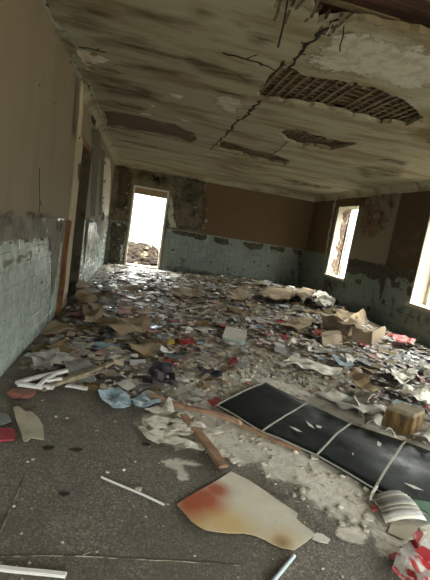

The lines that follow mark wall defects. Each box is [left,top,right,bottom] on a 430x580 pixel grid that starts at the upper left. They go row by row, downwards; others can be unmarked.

peeling [42,0,121,86]
crack [222,18,339,71]
peeling [254,0,430,125]
peeling [213,95,246,113]
crack [210,100,262,150]
spalling [216,142,287,165]
spalling [282,129,357,151]
spalling [84,105,198,264]
peeling [0,212,67,295]